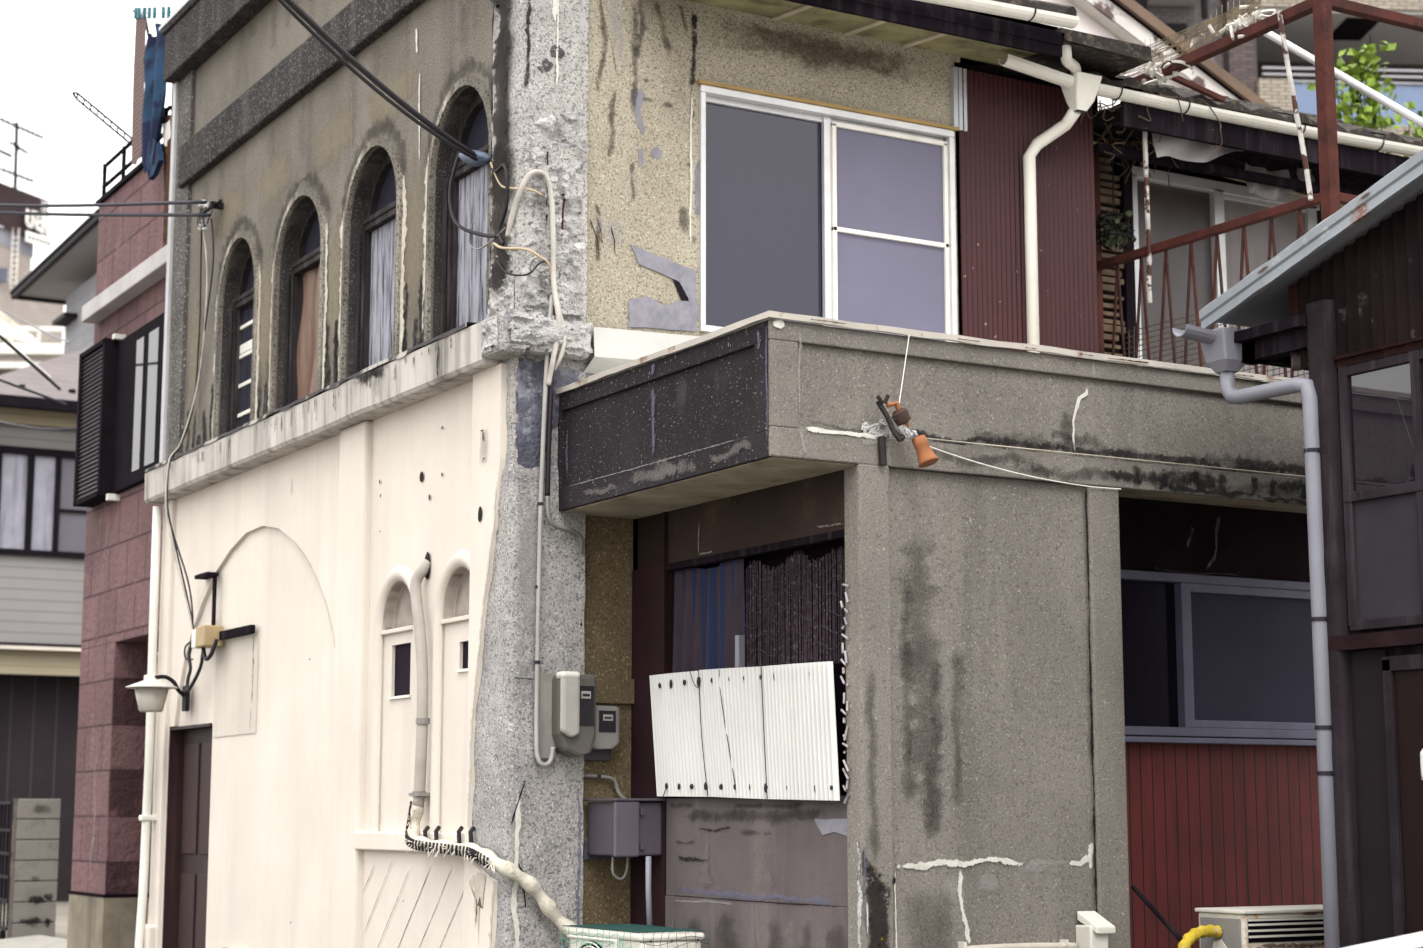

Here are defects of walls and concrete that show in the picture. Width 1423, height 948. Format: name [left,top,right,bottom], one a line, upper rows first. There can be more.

leakage [755,24,900,75]
leakage [402,275,425,352]
spalling [480,104,593,469]
leakage [256,361,269,418]
leakage [323,320,338,388]
leakage [916,429,1307,505]
crack [1070,842,1094,869]
crack [893,856,1023,948]